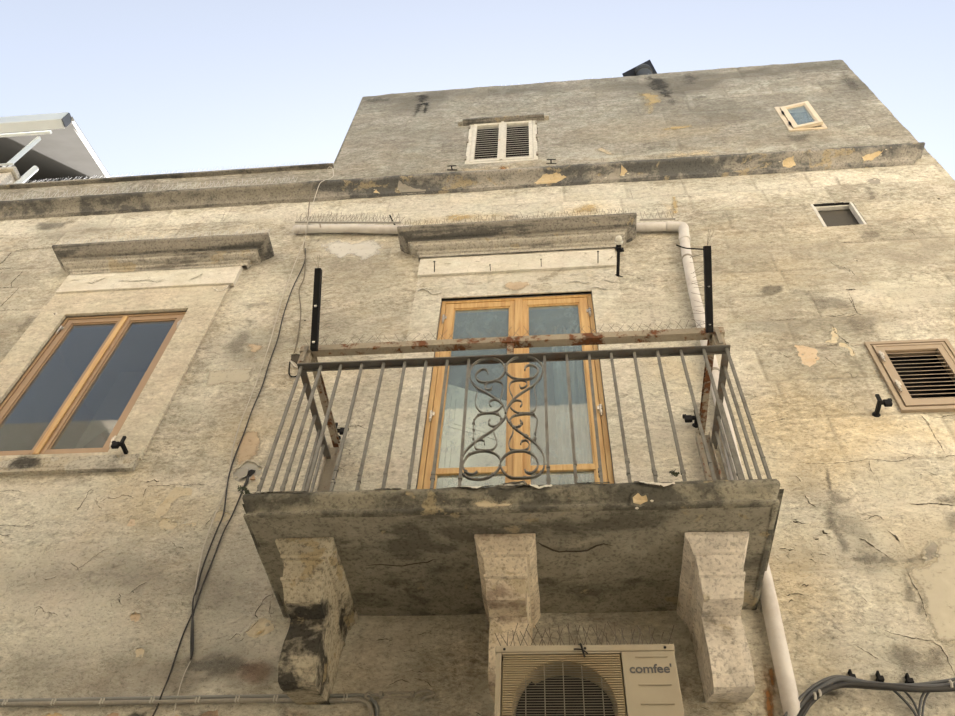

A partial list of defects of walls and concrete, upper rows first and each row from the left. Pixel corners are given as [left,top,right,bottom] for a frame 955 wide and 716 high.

flaking render [396,178,428,196]
flaking render [532,169,568,186]
flaking render [601,164,629,183]
flaking render [792,325,857,368]
crack [793,413,955,524]
crack [0,478,205,543]
crack [779,546,828,603]
crack [832,512,955,675]